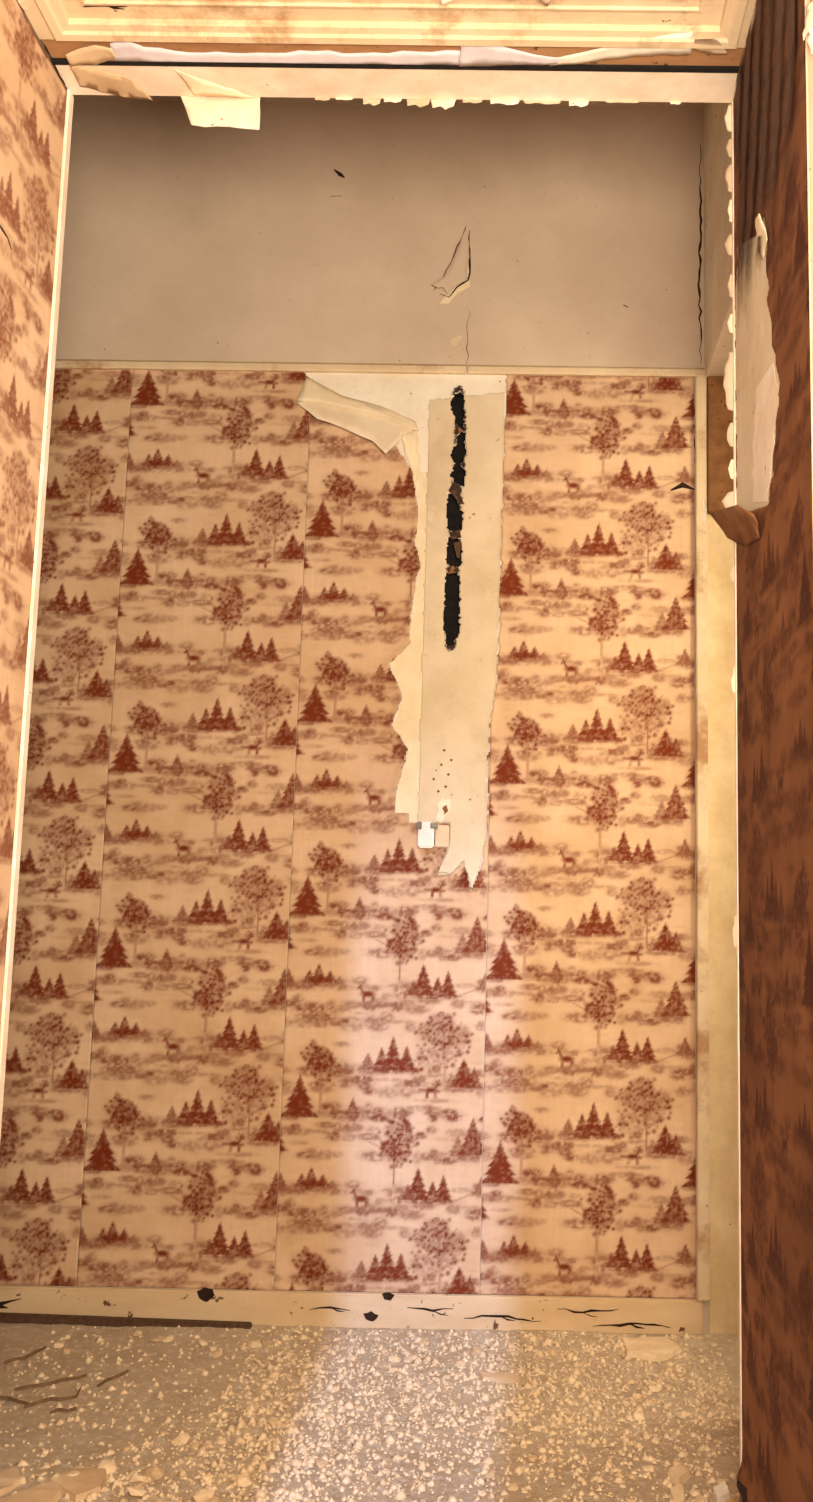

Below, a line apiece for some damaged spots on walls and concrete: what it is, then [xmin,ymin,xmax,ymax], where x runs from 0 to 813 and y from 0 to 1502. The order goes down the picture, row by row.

crack [83,3,127,11]
peeling [802,0,813,55]
peeling [65,32,728,101]
peeling [315,98,639,110]
flaking render [703,105,780,524]
flaking render [306,373,507,822]